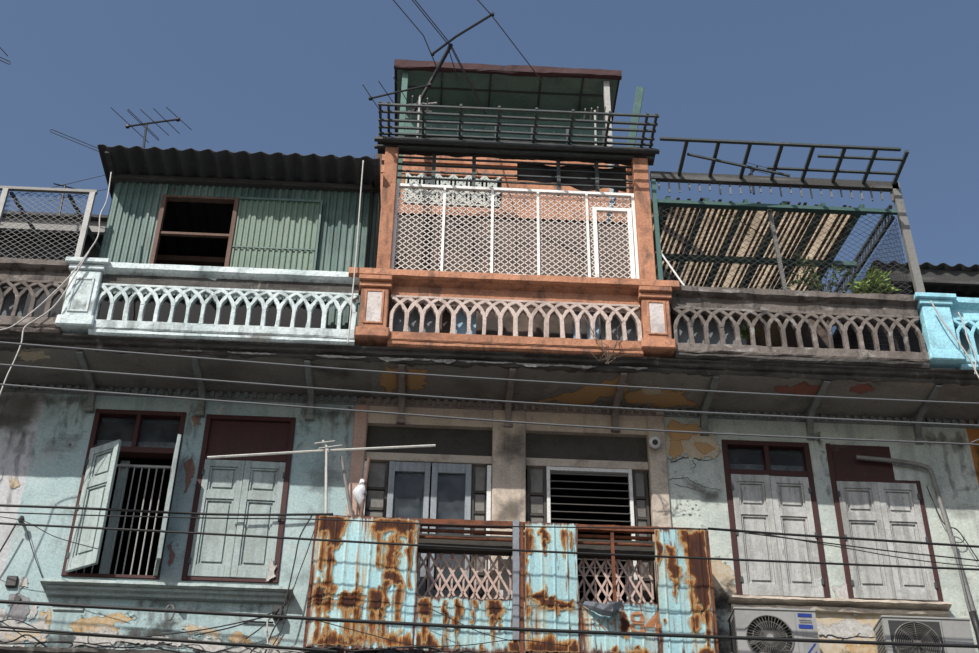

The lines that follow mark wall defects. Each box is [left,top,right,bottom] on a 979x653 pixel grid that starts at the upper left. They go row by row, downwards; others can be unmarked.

peeling [316,355,596,393]
peeling [538,366,699,408]
water stain [0,397,36,429]
peeling [665,420,722,461]
peeling [183,457,195,494]
peeling [0,576,52,647]
peeling [69,611,298,653]
rust [311,516,505,651]
rust [508,525,579,653]
rust [655,529,715,653]
peeling [816,613,881,653]